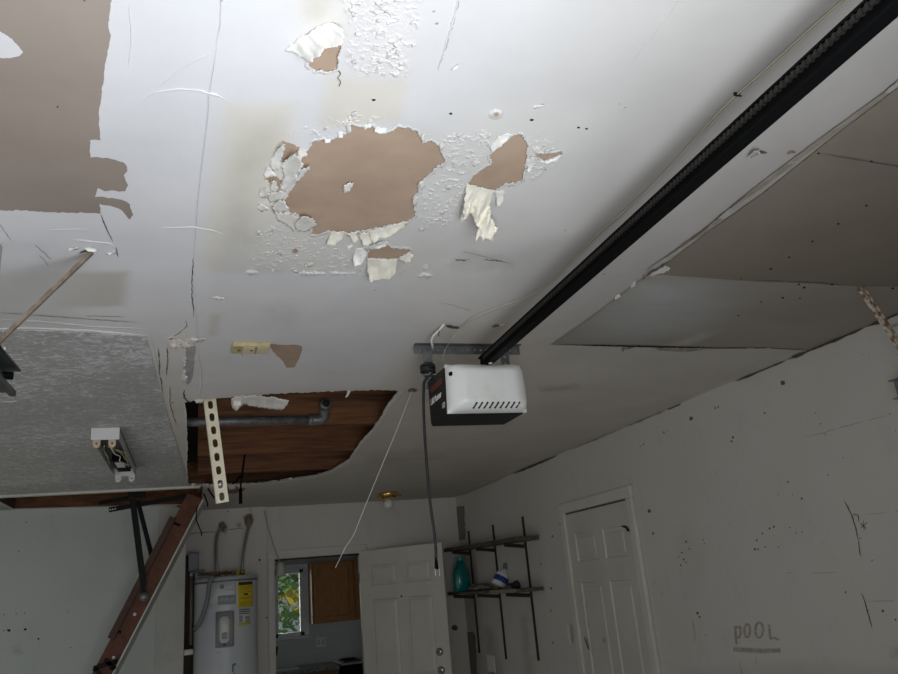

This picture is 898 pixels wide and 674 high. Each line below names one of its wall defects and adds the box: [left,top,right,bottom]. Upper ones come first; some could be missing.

peeling [285,0,425,87]
crack [437,0,459,70]
peeling [0,0,133,219]
crack [156,0,221,426]
peeling [240,121,567,283]
peeling [270,344,302,368]
crack [844,501,879,556]